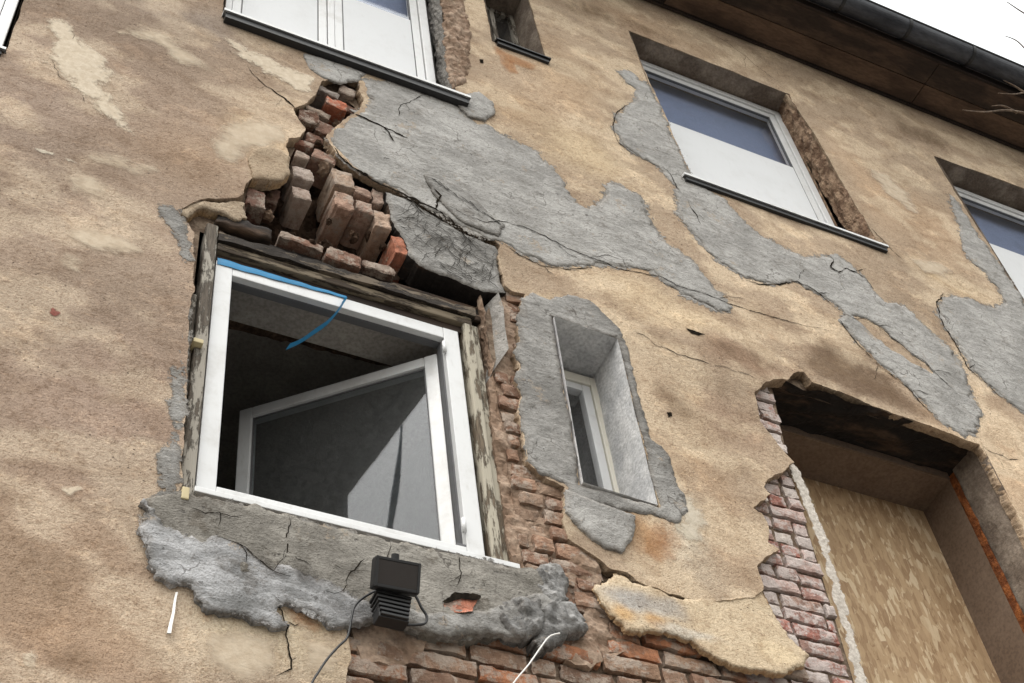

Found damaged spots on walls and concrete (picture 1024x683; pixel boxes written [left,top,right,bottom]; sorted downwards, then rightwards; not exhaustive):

crack [348,96,420,141]
peeling [871,169,917,213]
spalling [193,232,203,294]
crack [328,143,1011,424]
flaking render [207,38,867,683]
crack [194,508,311,675]
crack [328,543,391,594]